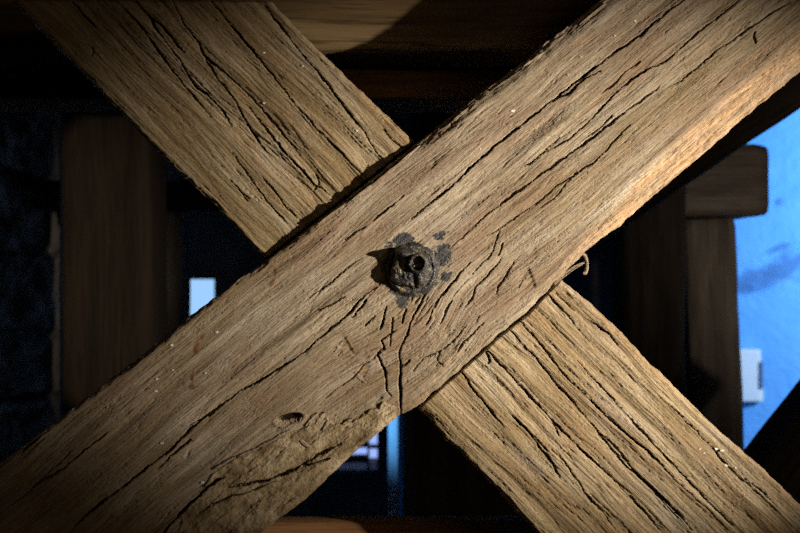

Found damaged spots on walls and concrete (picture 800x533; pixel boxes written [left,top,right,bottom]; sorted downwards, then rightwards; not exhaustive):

crack [122,0,330,195]
crack [230,152,296,223]
crack [211,1,377,200]
crack [327,0,738,414]
crack [680,2,790,82]
crack [10,432,108,506]
crack [70,284,380,533]
crack [461,326,733,530]
crack [671,406,770,500]